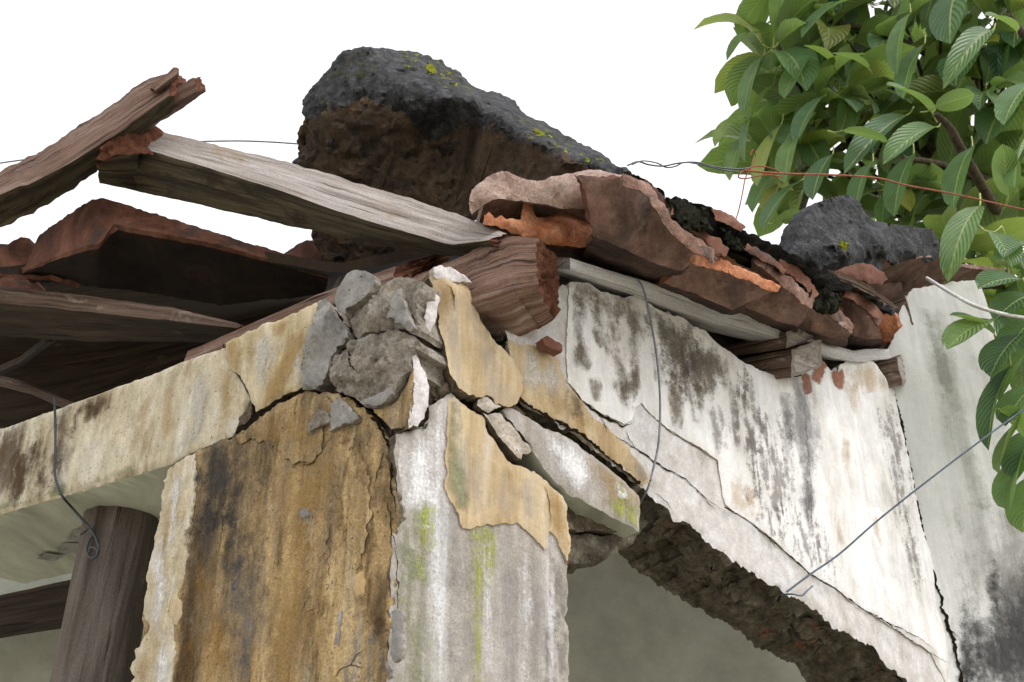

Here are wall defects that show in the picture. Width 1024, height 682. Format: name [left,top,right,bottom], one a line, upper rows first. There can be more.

peeling [334,270,381,319]
peeling [386,288,440,333]
leakage [0,398,109,500]
leakage [154,443,253,682]
crack [229,309,429,608]
leakage [398,425,448,662]
flaking render [444,396,571,564]
efflorescence [551,439,588,489]
leakage [574,284,833,570]
crack [455,383,964,682]
leakage [879,410,920,586]
mould [961,561,1024,682]